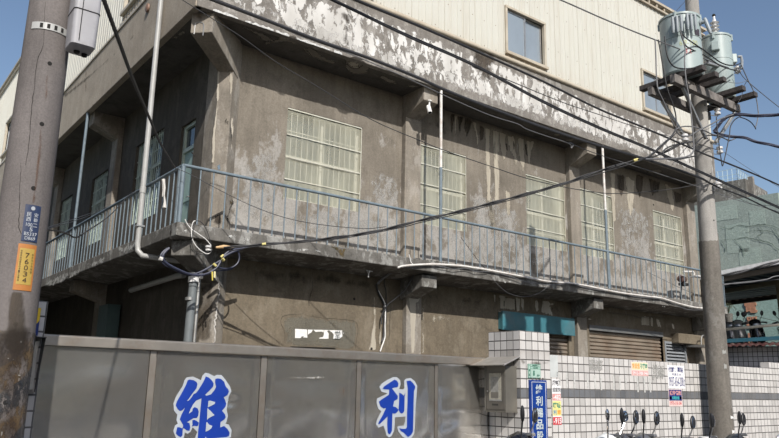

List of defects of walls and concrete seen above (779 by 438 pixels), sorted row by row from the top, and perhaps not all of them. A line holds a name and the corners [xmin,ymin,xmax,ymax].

crack [18,43,44,233]
peeling [213,0,695,170]
damp [442,114,534,231]
damp [8,292,24,333]
crack [213,277,221,342]